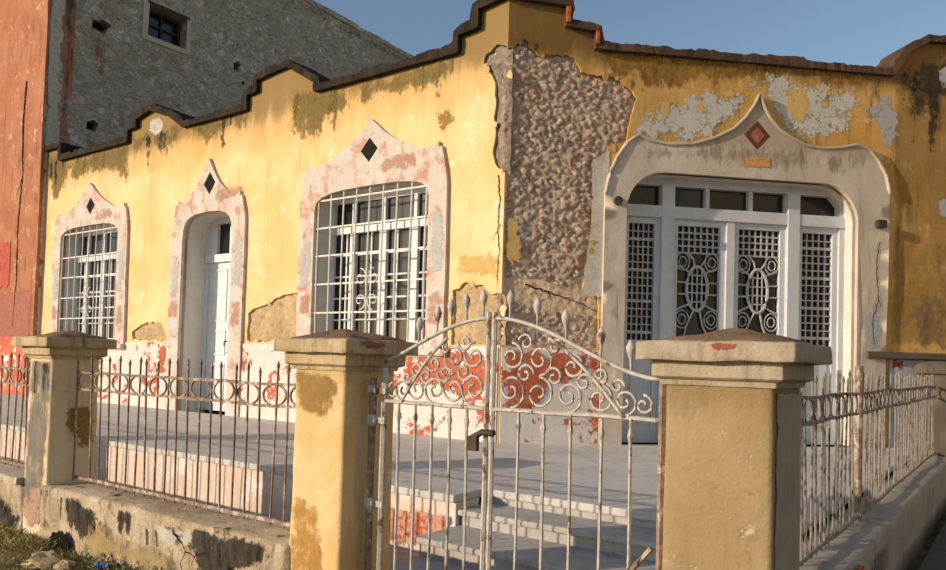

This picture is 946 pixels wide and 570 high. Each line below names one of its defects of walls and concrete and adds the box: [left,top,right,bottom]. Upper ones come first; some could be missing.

damp [901,61,946,151]
peeling [381,153,416,173]
spalling [403,37,899,409]
peeling [117,247,125,293]
spalling [131,256,179,379]
spalling [230,242,310,344]
crack [872,243,883,345]
damp [60,497,167,570]
damp [190,528,261,570]